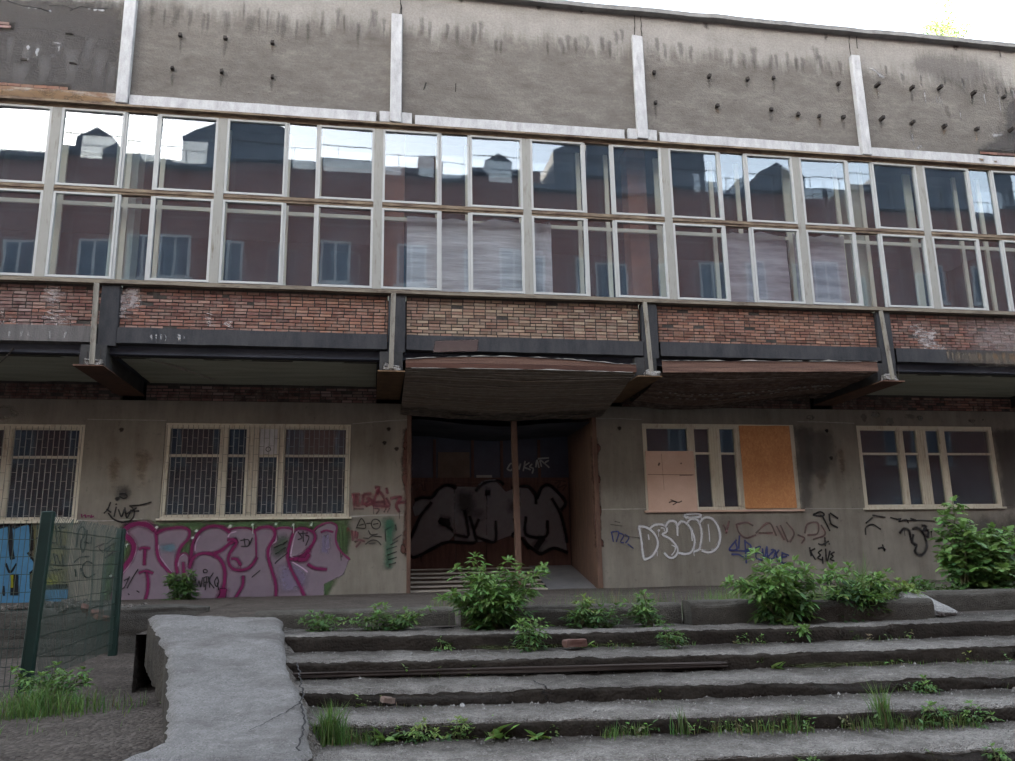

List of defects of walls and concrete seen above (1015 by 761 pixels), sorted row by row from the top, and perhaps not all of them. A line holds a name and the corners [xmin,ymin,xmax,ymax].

leakage [0,0,122,94]
leakage [911,324,1015,366]